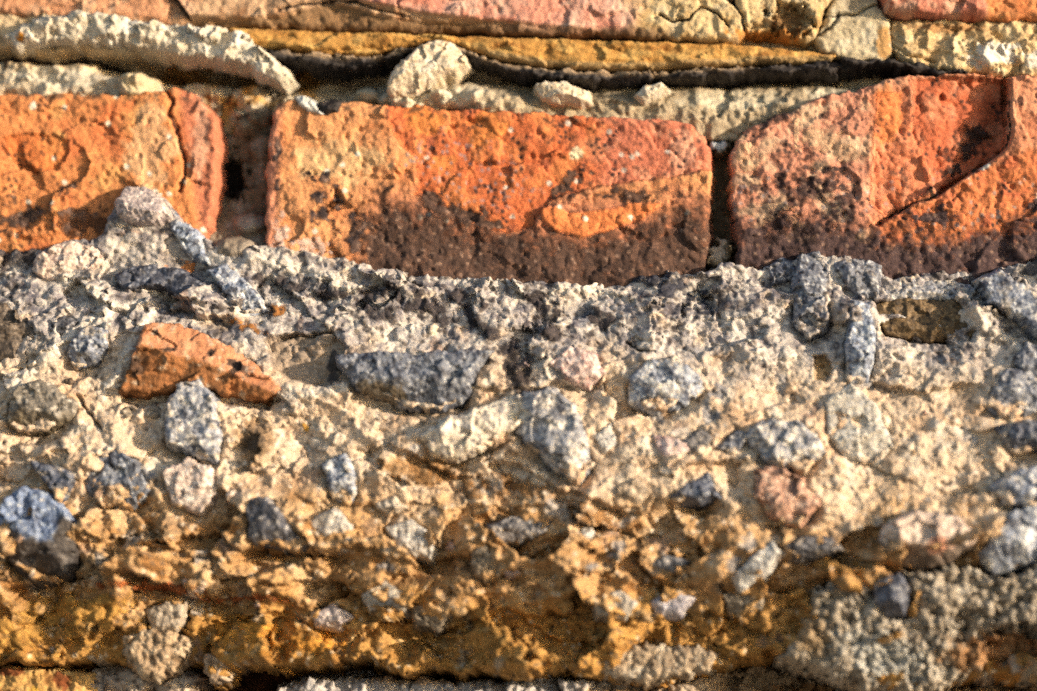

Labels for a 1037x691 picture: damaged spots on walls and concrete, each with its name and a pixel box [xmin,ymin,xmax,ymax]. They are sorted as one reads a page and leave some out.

crack [173,0,192,22]
crack [660,0,745,32]
crack [820,3,874,35]
crack [971,103,1011,173]
crack [897,187,937,213]
spalling [264,331,345,386]
spalling [814,356,831,381]